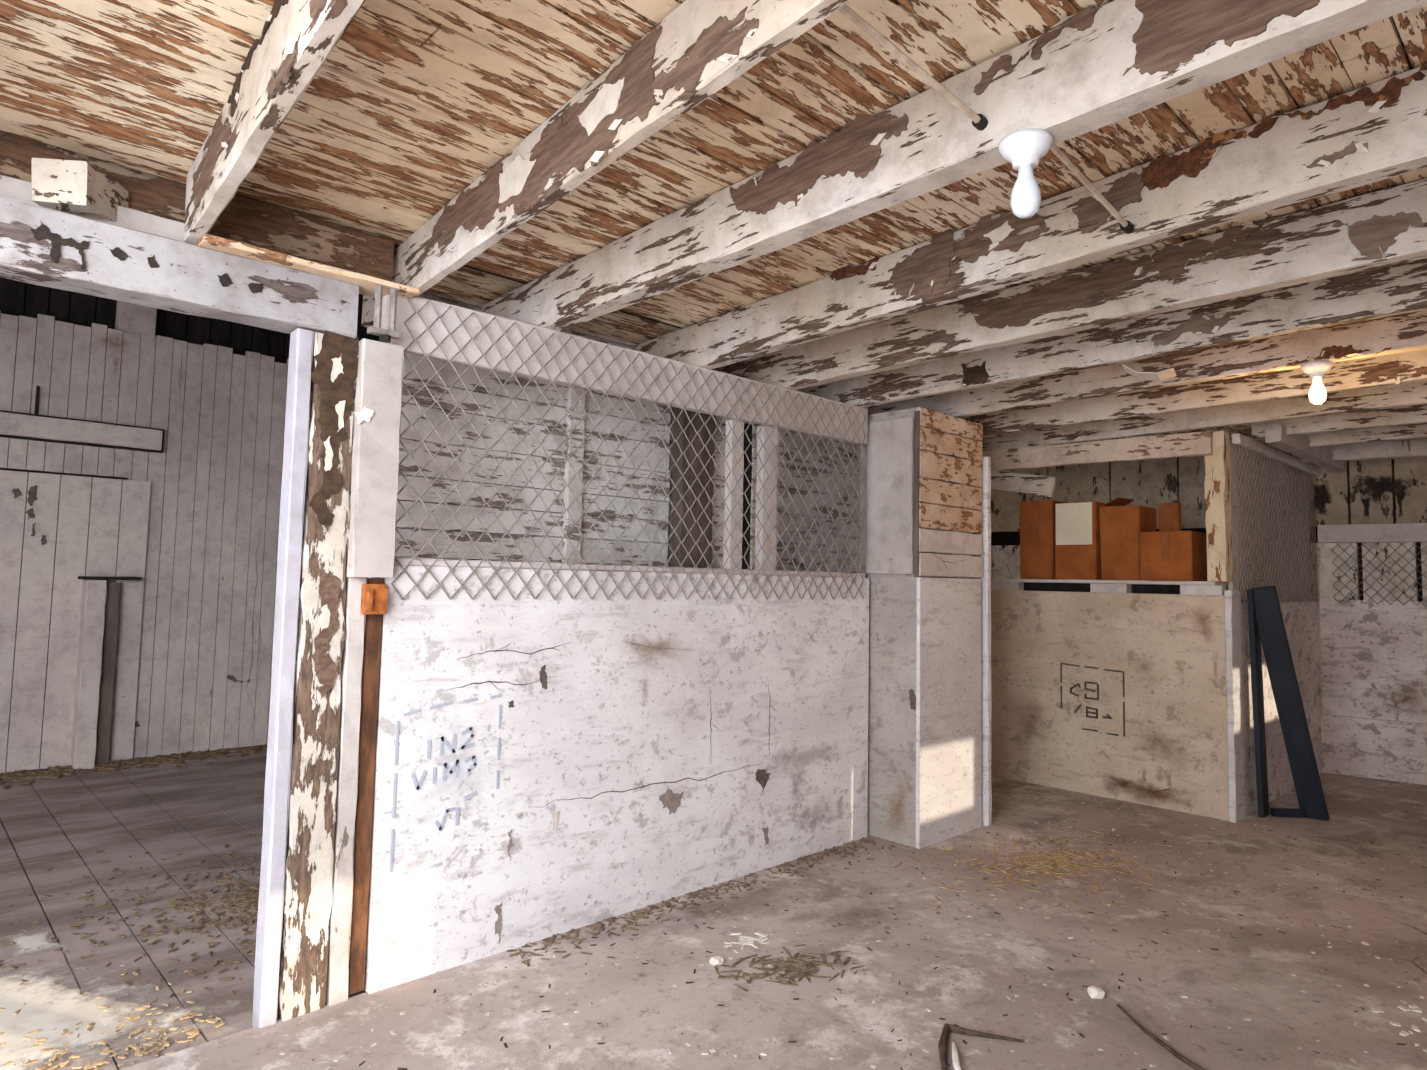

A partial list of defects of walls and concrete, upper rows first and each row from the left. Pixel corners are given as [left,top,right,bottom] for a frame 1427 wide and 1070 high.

peeling [193,0,289,208]
peeling [432,6,759,255]
peeling [729,113,909,214]
peeling [973,6,1102,95]
peeling [1072,65,1427,229]
peeling [829,211,1050,300]
peeling [966,217,1275,329]
peeling [1332,212,1427,260]
peeling [309,331,374,526]
damp [1311,480,1331,514]
damp [1356,476,1416,517]
peeling [312,571,341,699]